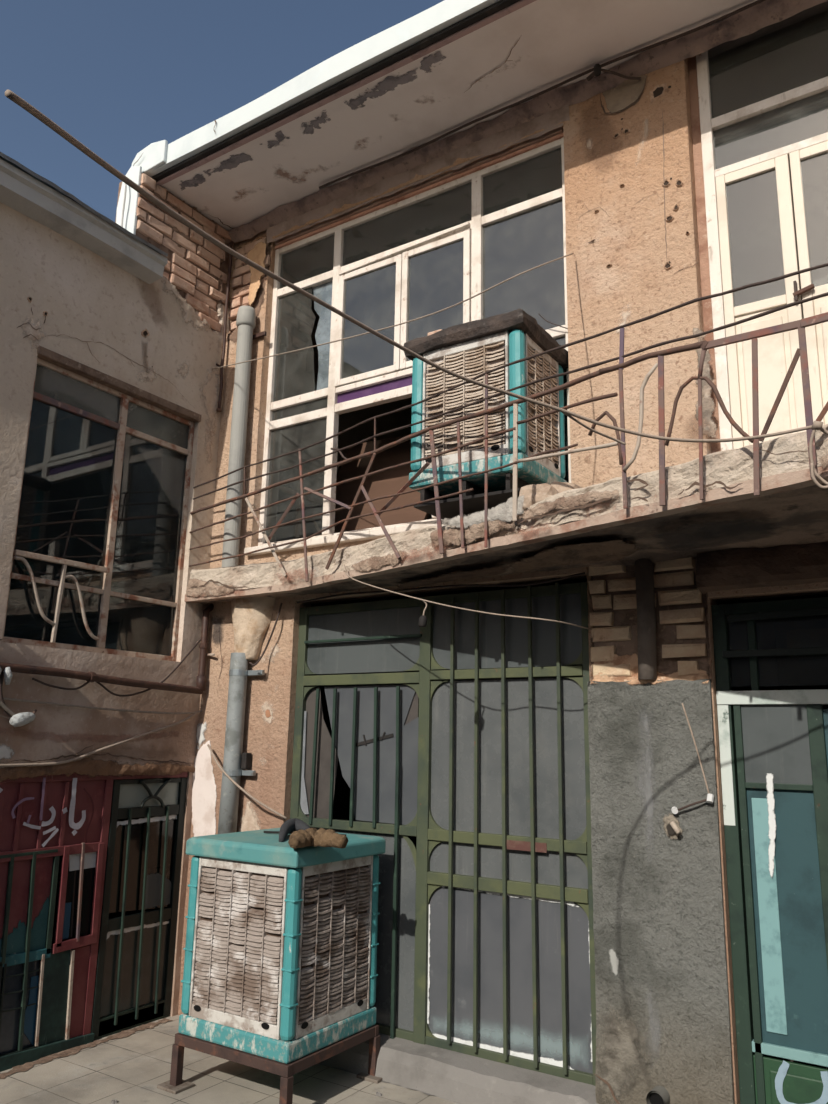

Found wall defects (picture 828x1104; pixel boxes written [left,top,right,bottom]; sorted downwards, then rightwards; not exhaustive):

flaking render [344,52,446,110]
crack [465,36,521,92]
flaking render [260,131,289,148]
flaking render [301,110,331,134]
flaking render [136,153,271,343]
crack [17,307,189,403]
spalling [693,328,717,438]
spalling [430,490,619,547]
spalling [351,551,407,572]
spalling [0,722,217,837]